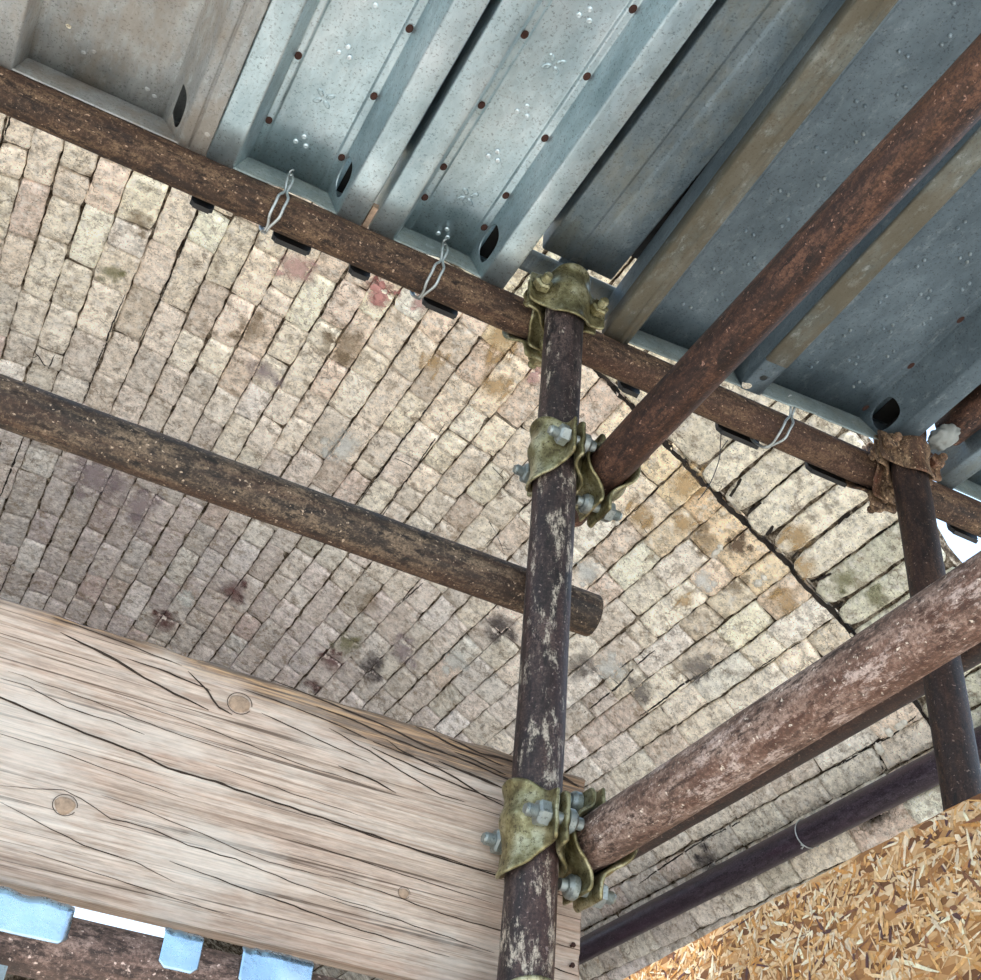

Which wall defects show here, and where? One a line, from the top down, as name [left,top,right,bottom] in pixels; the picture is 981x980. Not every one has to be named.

crack [593,370,635,410]
crack [662,440,856,638]
damp [223,580,247,603]
damp [153,610,176,629]